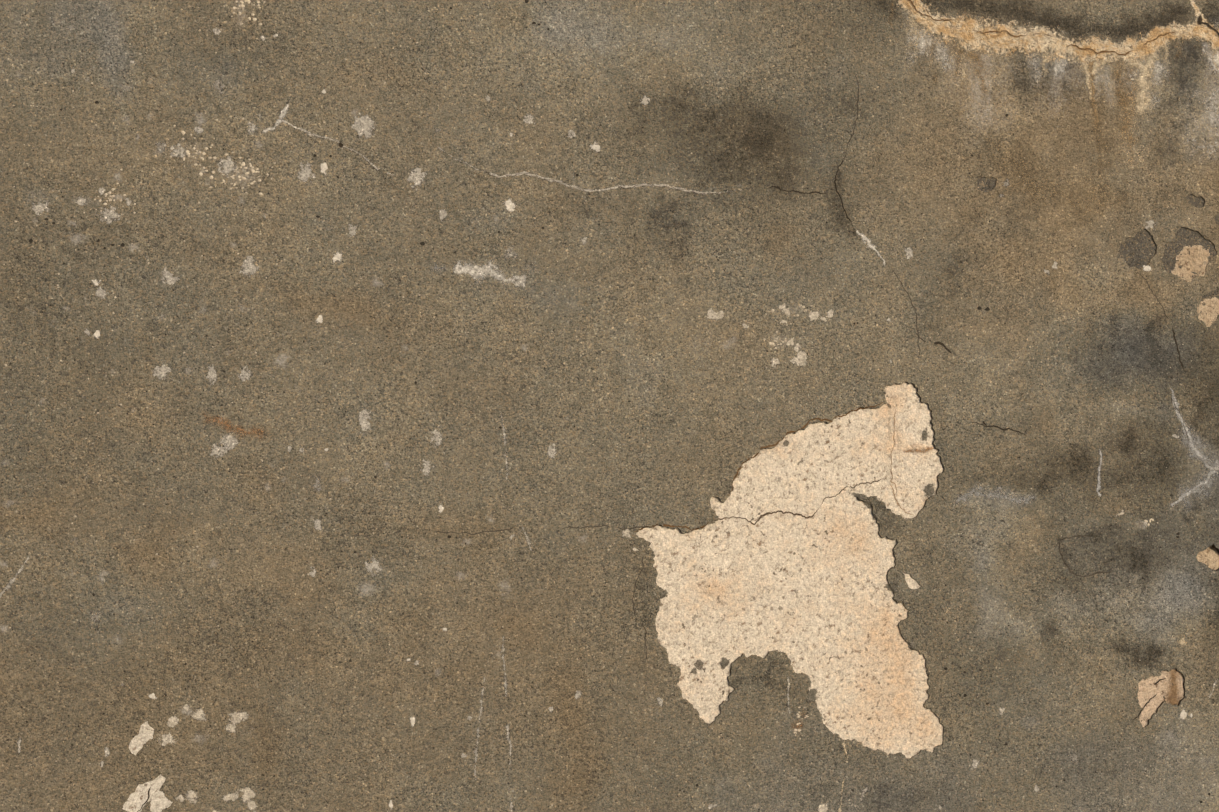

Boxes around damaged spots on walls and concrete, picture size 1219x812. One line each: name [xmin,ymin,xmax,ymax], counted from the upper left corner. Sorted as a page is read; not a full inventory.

crack [896,0,1219,66]
water stain [909,0,1219,164]
crack [438,77,952,359]
spalling [1185,194,1205,208]
spalling [1117,226,1217,282]
spalling [1197,289,1219,327]
crack [1136,270,1219,506]
flaking render [622,381,945,759]
spalling [1196,544,1219,571]
spalling [1133,668,1193,728]